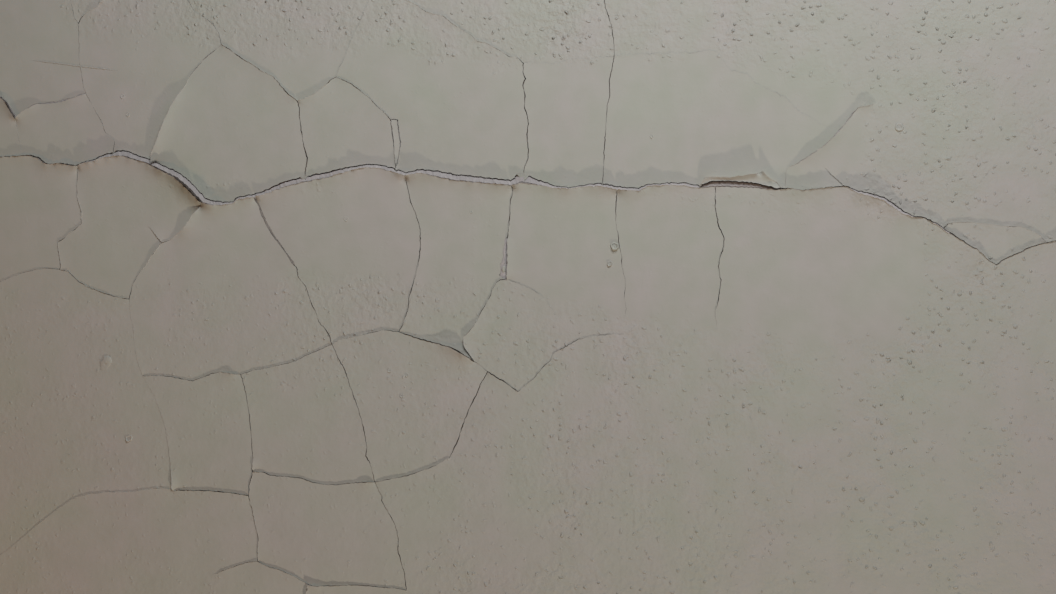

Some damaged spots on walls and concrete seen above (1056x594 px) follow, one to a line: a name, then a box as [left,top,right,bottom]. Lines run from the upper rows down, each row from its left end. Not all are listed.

peeling [0,155,561,590]
crack [359,493,407,590]
peeling [0,0,925,352]
crack [4,59,1056,497]
crack [604,0,615,118]